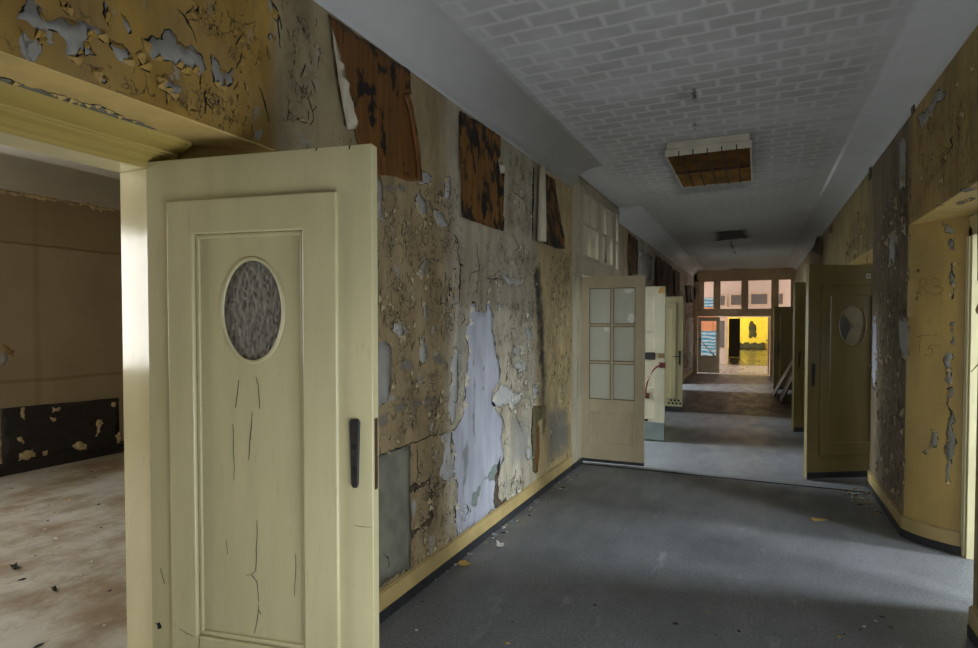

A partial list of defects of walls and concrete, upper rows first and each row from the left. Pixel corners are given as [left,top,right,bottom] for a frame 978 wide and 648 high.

peeling [0,0,277,135]
spalling [17,437,48,461]
spalling [72,419,103,450]
spalling [377,170,572,588]
peeling [922,322,957,485]